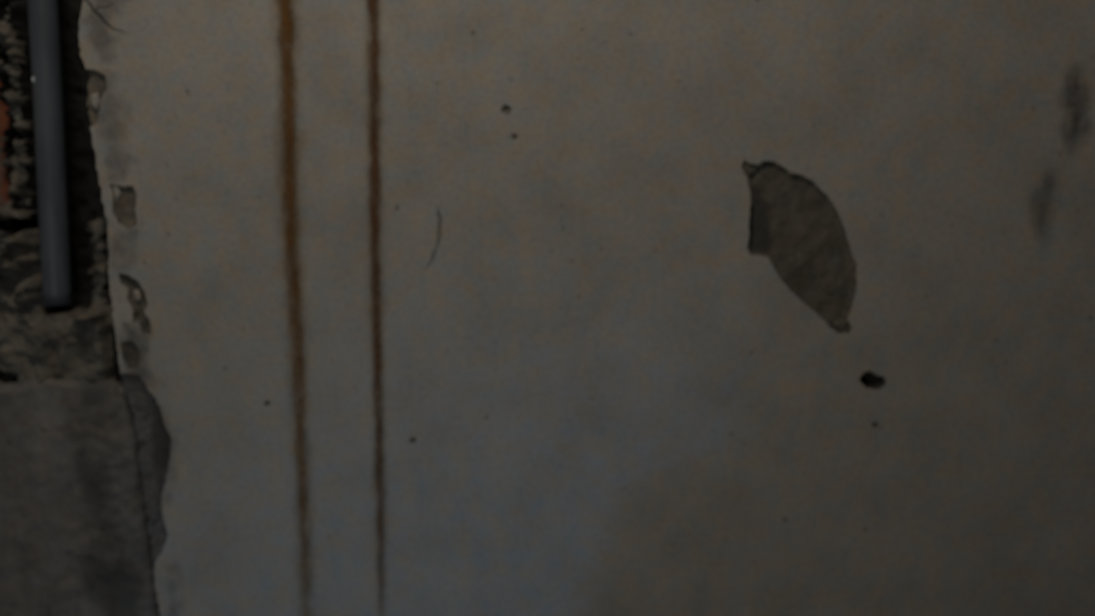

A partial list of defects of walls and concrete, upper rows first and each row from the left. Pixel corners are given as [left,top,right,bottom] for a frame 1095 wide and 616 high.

flaking render [0,0,172,572]
corrosion [281,0,300,338]
corrosion [368,0,381,399]
peeling [742,159,857,333]